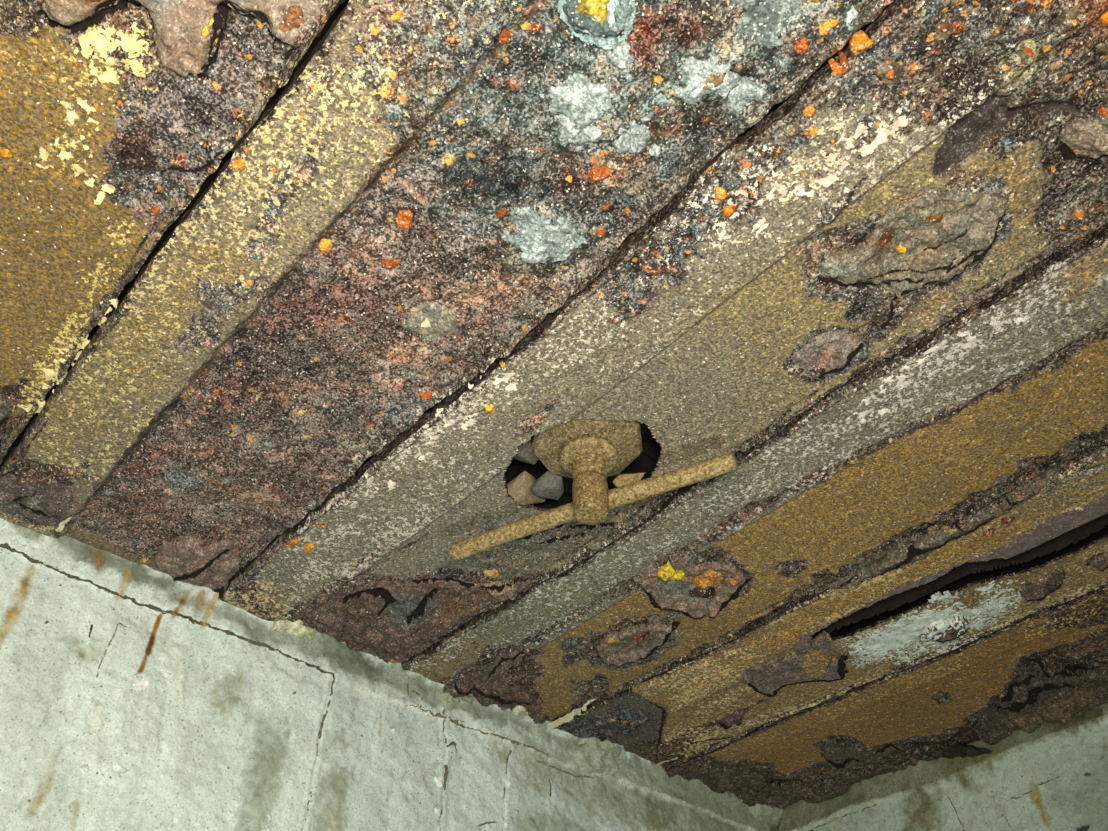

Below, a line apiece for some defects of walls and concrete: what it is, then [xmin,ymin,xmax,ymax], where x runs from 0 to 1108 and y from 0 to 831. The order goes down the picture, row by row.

corrosion [37,0,324,79]
corrosion [557,0,637,50]
damp [538,40,634,147]
damp [673,55,771,112]
crack [161,108,274,174]
damp [501,205,590,264]
peeling [990,309,1029,337]
peeling [853,330,977,423]
crack [514,484,701,544]
crack [0,543,335,756]
corrosion [139,529,241,673]
peeling [845,573,1025,666]